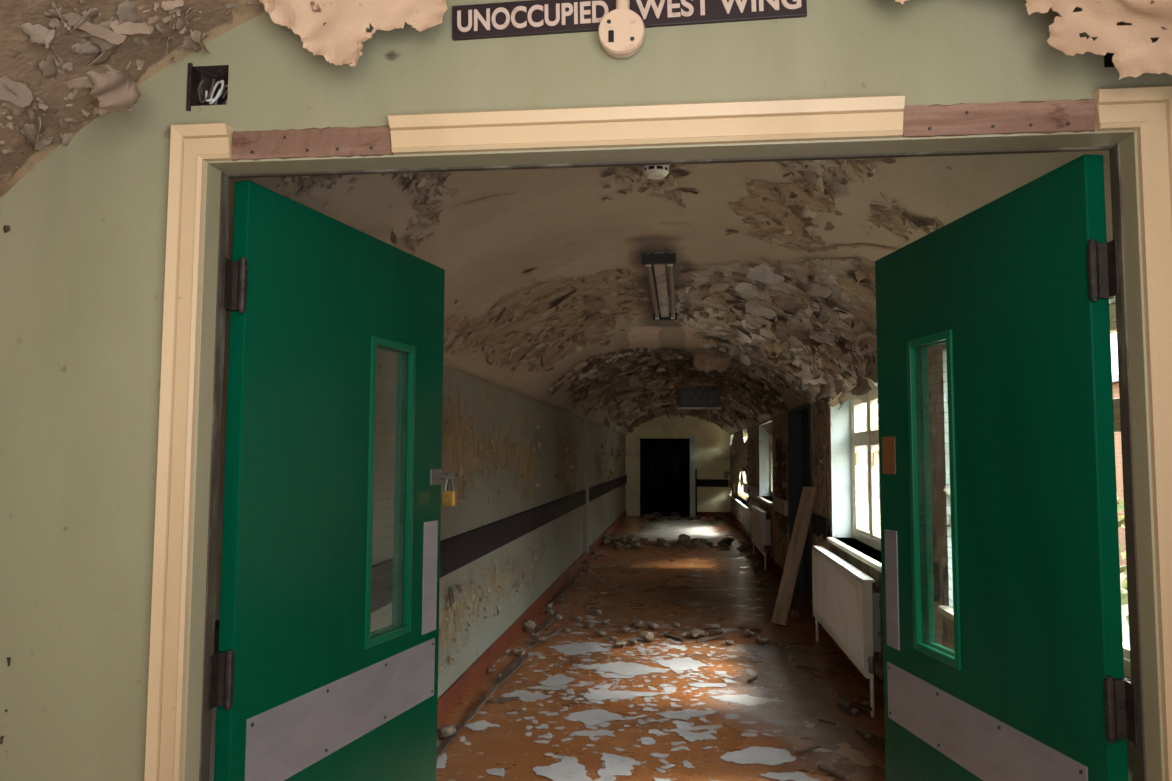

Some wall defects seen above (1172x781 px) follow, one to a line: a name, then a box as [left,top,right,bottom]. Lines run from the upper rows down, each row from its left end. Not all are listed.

peeling [1025,0,1172,80]
peeling [0,0,448,183]
peeling [381,172,459,255]
peeling [861,192,944,241]
peeling [444,158,896,540]